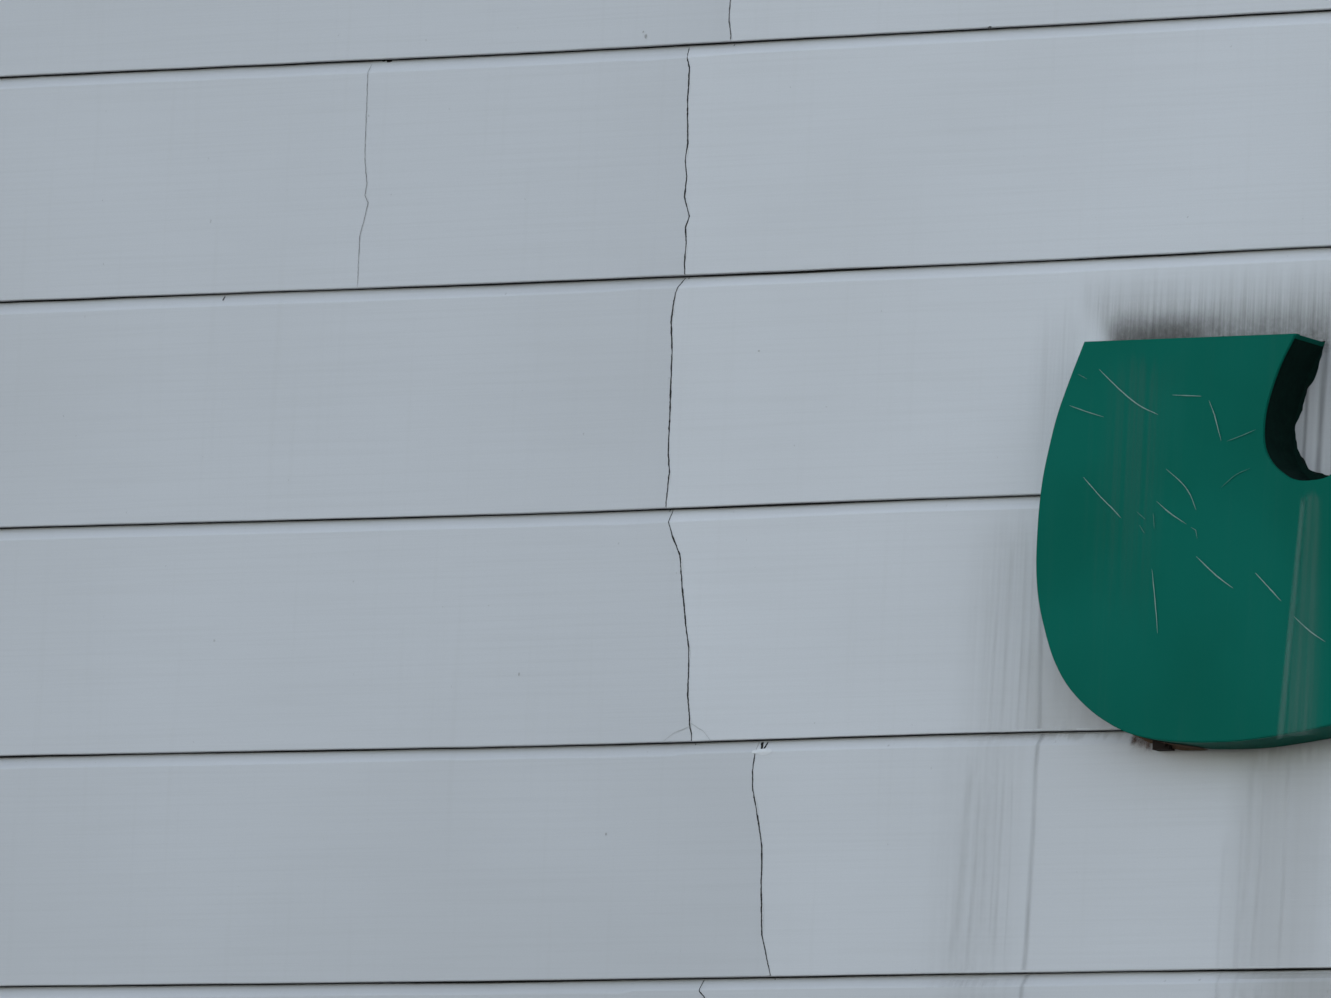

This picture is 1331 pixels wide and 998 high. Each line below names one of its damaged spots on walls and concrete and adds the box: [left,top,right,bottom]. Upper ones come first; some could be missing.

crack [357,67,371,283]
crack [664,49,710,745]
crack [752,754,771,976]